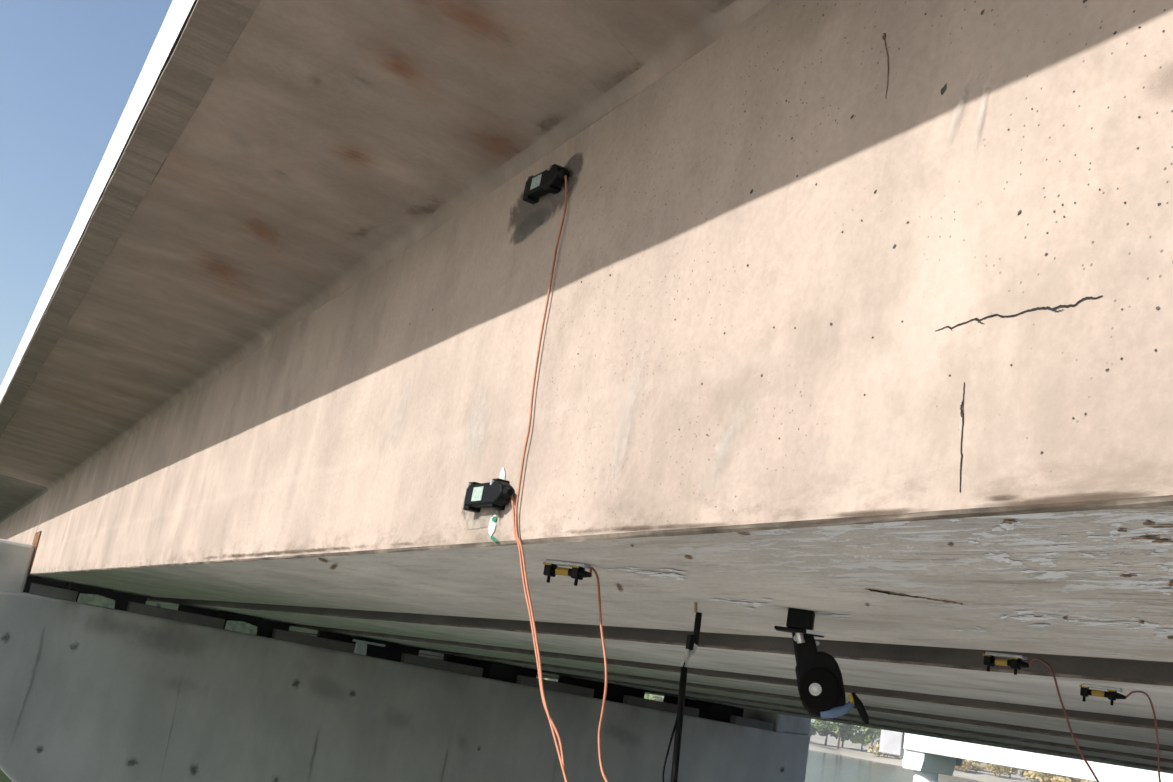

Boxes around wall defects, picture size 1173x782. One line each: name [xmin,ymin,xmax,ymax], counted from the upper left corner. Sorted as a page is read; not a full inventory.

crack [881,33,889,99]
crack [935,295,1103,331]
crack [958,382,966,492]
peeling [967,514,1173,595]
spalling [865,589,966,605]
peeling [999,610,1173,639]